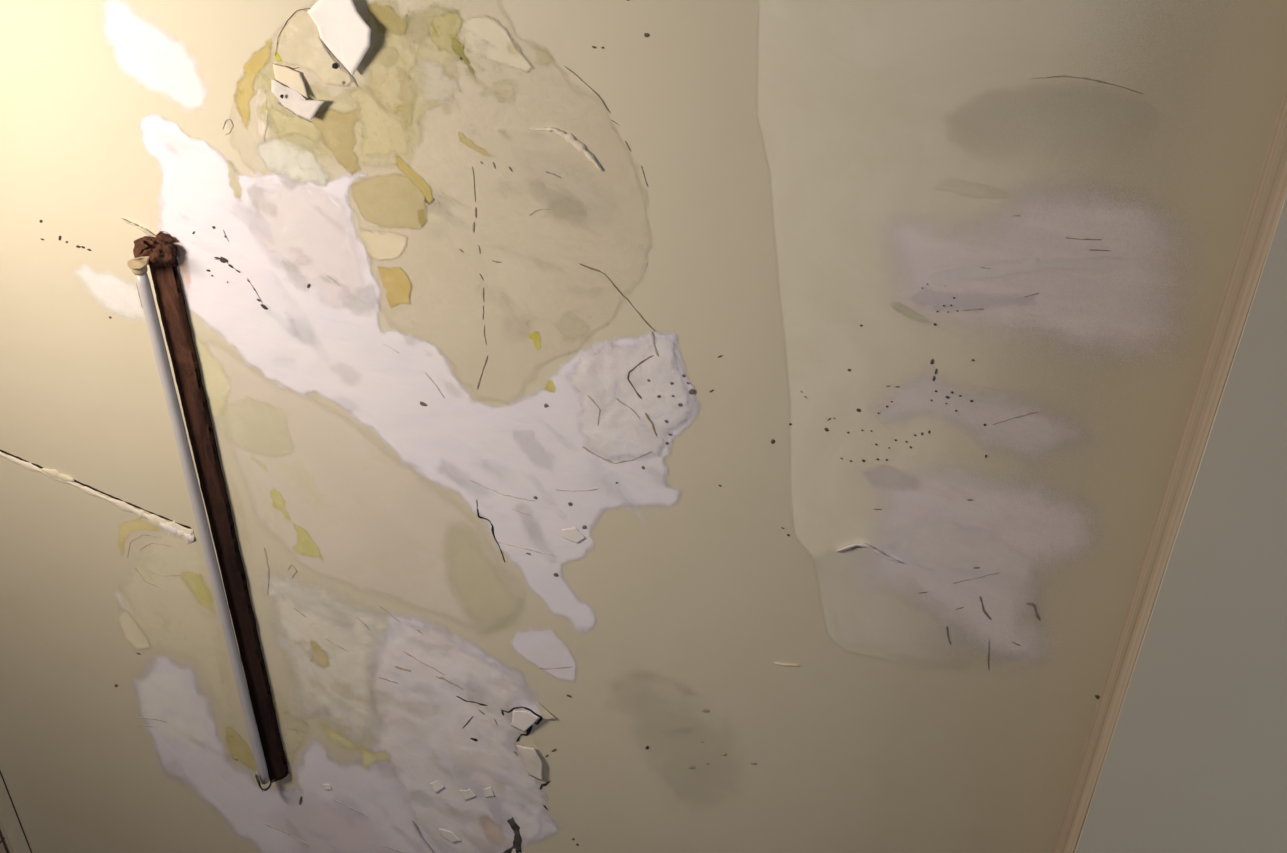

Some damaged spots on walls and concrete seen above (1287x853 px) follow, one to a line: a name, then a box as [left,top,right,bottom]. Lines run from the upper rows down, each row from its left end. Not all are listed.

peeling [271,0,371,123]
peeling [358,228,407,261]
crack [0,450,194,588]
rust [127,231,289,791]
spalling [503,817,522,853]